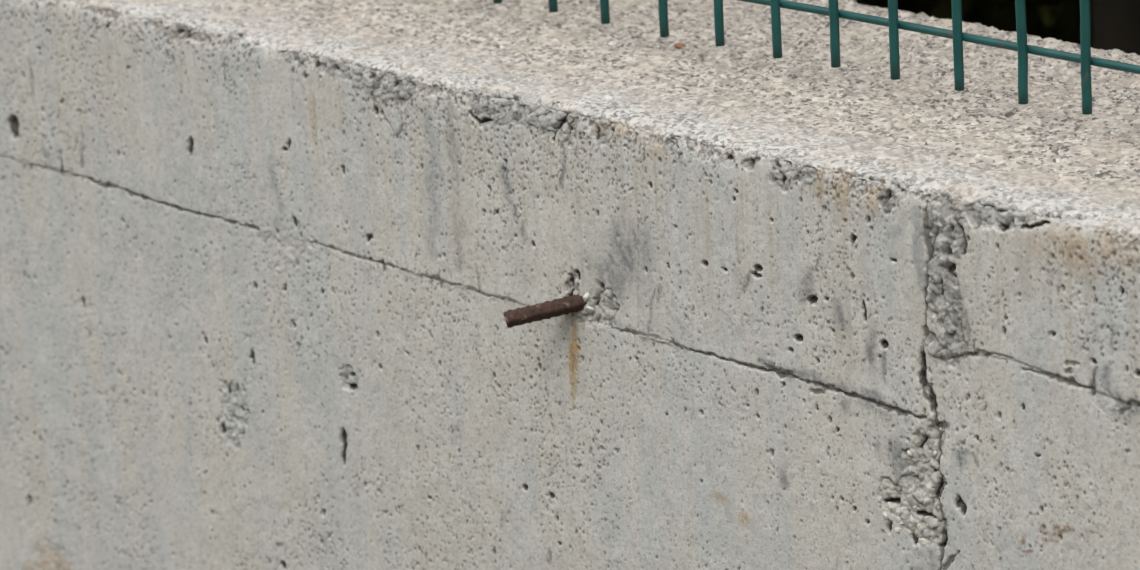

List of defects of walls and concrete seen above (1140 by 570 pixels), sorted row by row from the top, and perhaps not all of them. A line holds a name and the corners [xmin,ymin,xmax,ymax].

crack [42,150,260,230]
crack [313,241,517,303]
spalling [503,269,620,330]
spalling [923,195,1080,366]
crack [612,202,1097,570]
crack [1119,401,1140,414]
spalling [877,424,948,546]